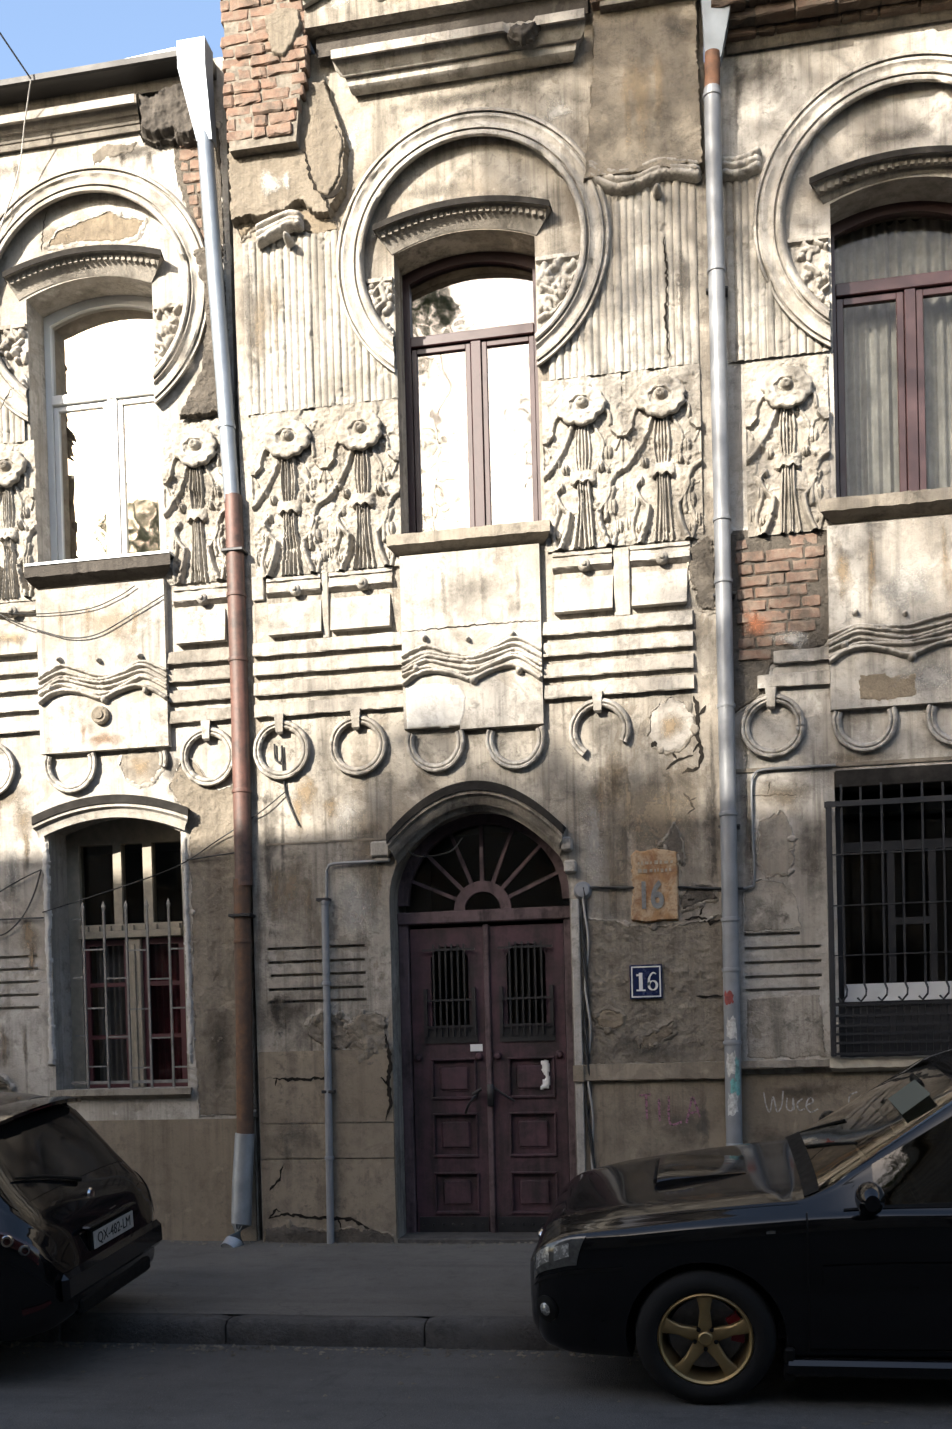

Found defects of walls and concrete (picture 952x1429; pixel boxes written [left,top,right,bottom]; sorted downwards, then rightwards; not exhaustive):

flaking render [172,0,343,422]
flaking render [687,527,829,717]
crack [273,1076,333,1085]
crack [381,1034,393,1120]
crack [268,1166,380,1233]